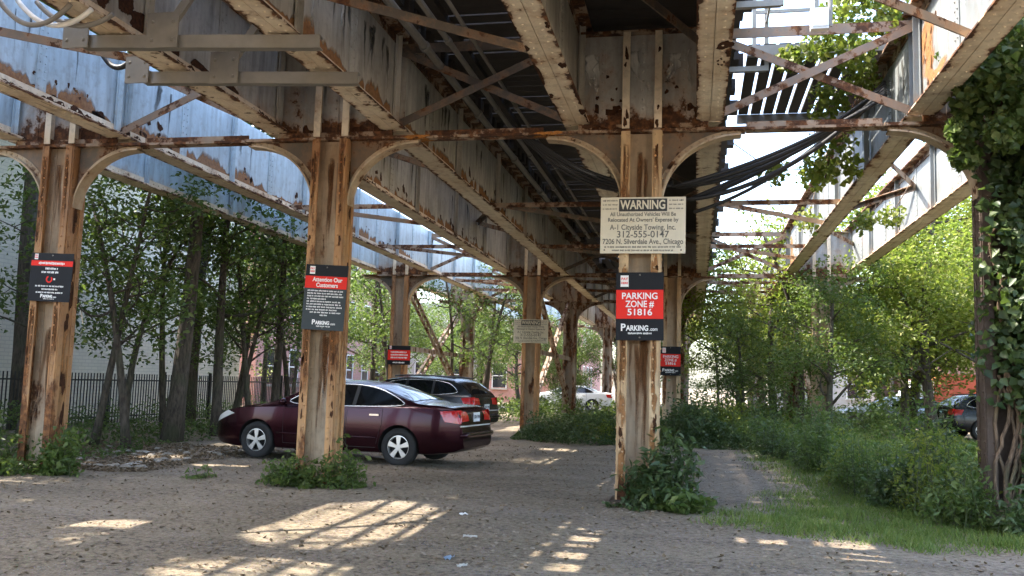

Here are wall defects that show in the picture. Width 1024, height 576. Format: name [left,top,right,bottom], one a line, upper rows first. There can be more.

peeling [41,80,105,124]
corrosion [265,0,347,72]
peeling [509,16,563,121]
peeling [571,84,589,123]
corrosion [716,0,737,112]
corrosion [921,21,946,86]
corrosion [131,122,309,212]
corrosion [314,154,351,218]
corrosion [347,79,553,259]
corrosion [610,148,659,197]
corrosion [43,313,68,394]
corrosion [618,340,657,458]